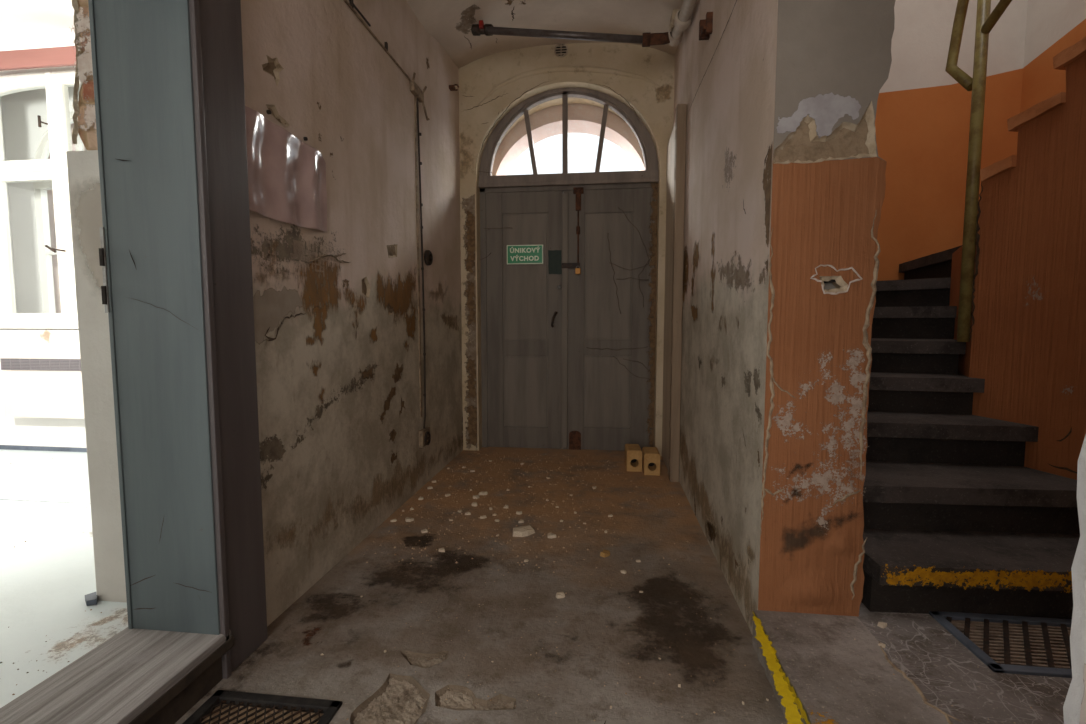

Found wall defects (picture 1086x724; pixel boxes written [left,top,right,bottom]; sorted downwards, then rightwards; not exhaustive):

flaking render [70,0,98,150]
flaking render [387,244,397,258]
flaking render [717,92,880,531]
water stain [302,593,362,622]
water stain [368,534,489,593]
water stain [619,575,740,685]
water stain [680,430,750,613]
spalling [350,673,516,724]